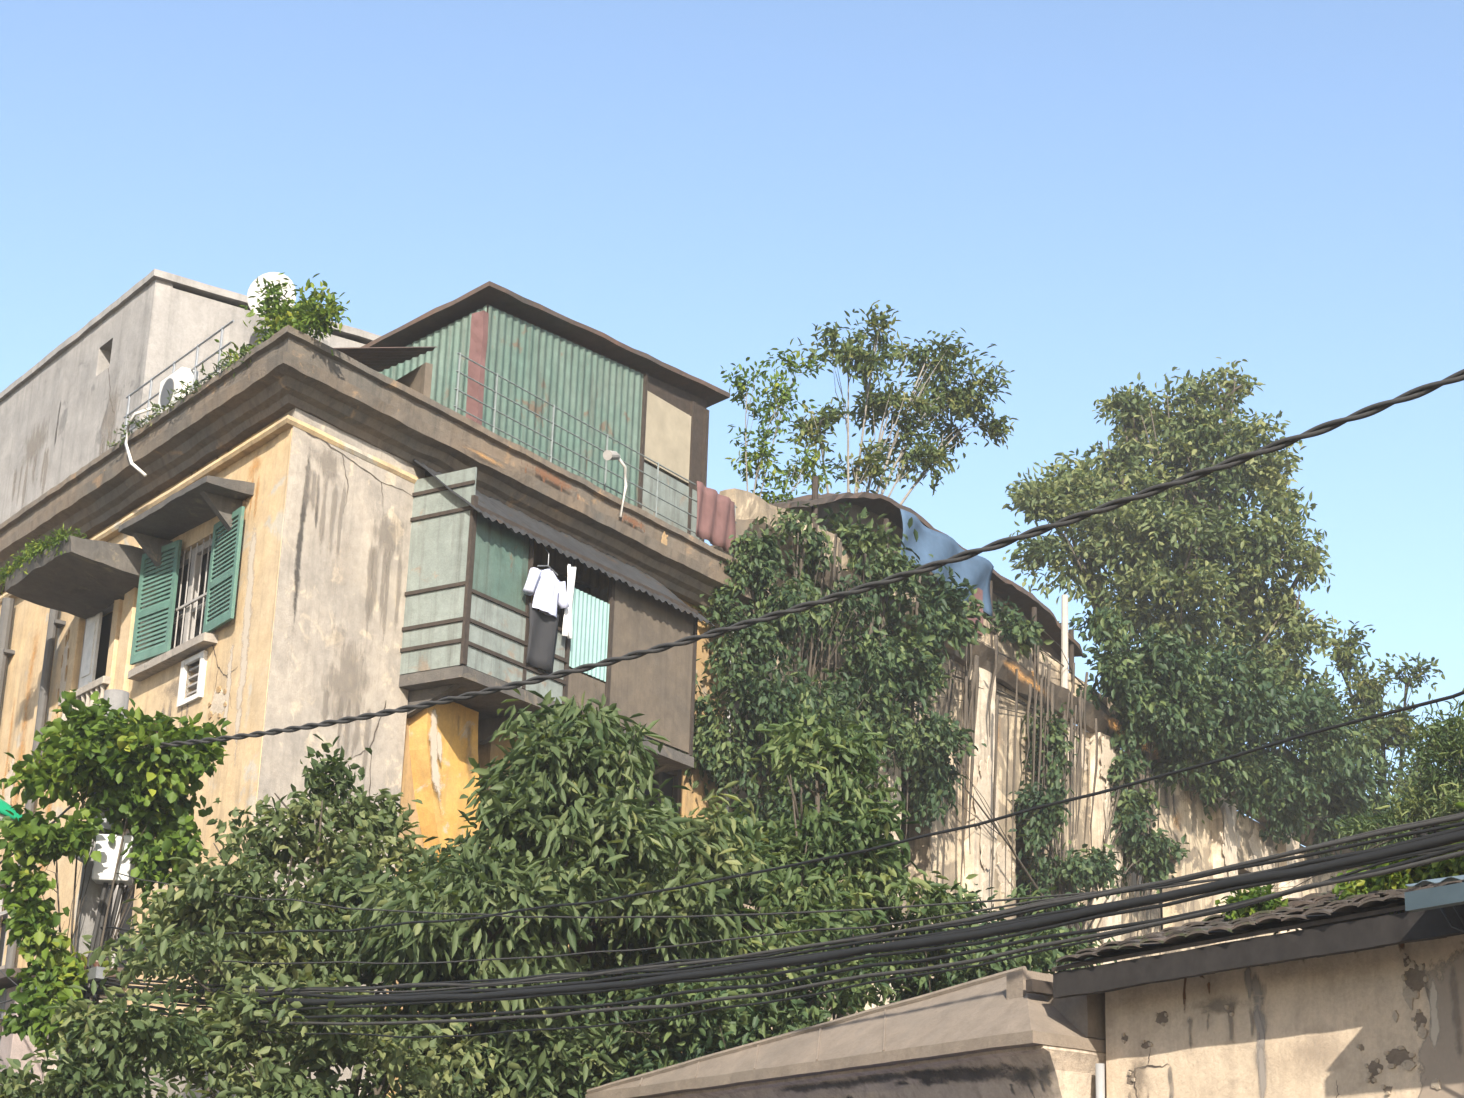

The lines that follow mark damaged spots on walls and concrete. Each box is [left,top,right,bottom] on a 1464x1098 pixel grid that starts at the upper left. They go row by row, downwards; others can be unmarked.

damp [294,453,345,614]
damp [366,520,401,630]
damp [783,1065,1052,1098]
damp [1188,968,1266,1098]
spalling [1356,950,1464,1098]